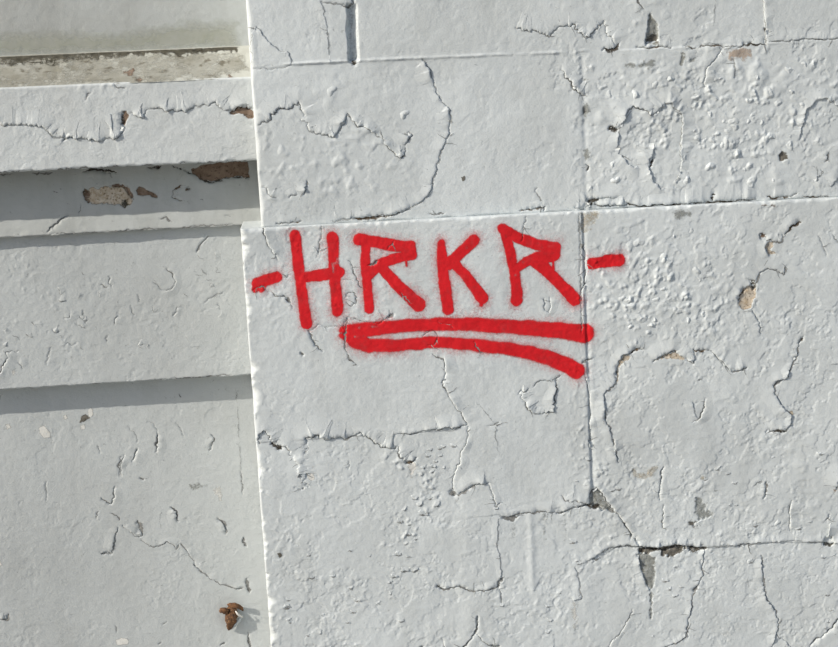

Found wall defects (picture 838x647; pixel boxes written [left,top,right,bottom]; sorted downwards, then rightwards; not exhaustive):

peeling [516,7,671,57]
spalling [76,176,157,208]
spalling [167,161,250,193]
crack [315,59,456,254]
crack [577,213,594,328]
spalling [730,274,756,310]
crack [744,311,762,338]
crack [746,214,802,286]
crack [93,425,251,593]
spalling [589,485,622,510]
crack [398,322,838,647]
peeling [633,544,706,618]